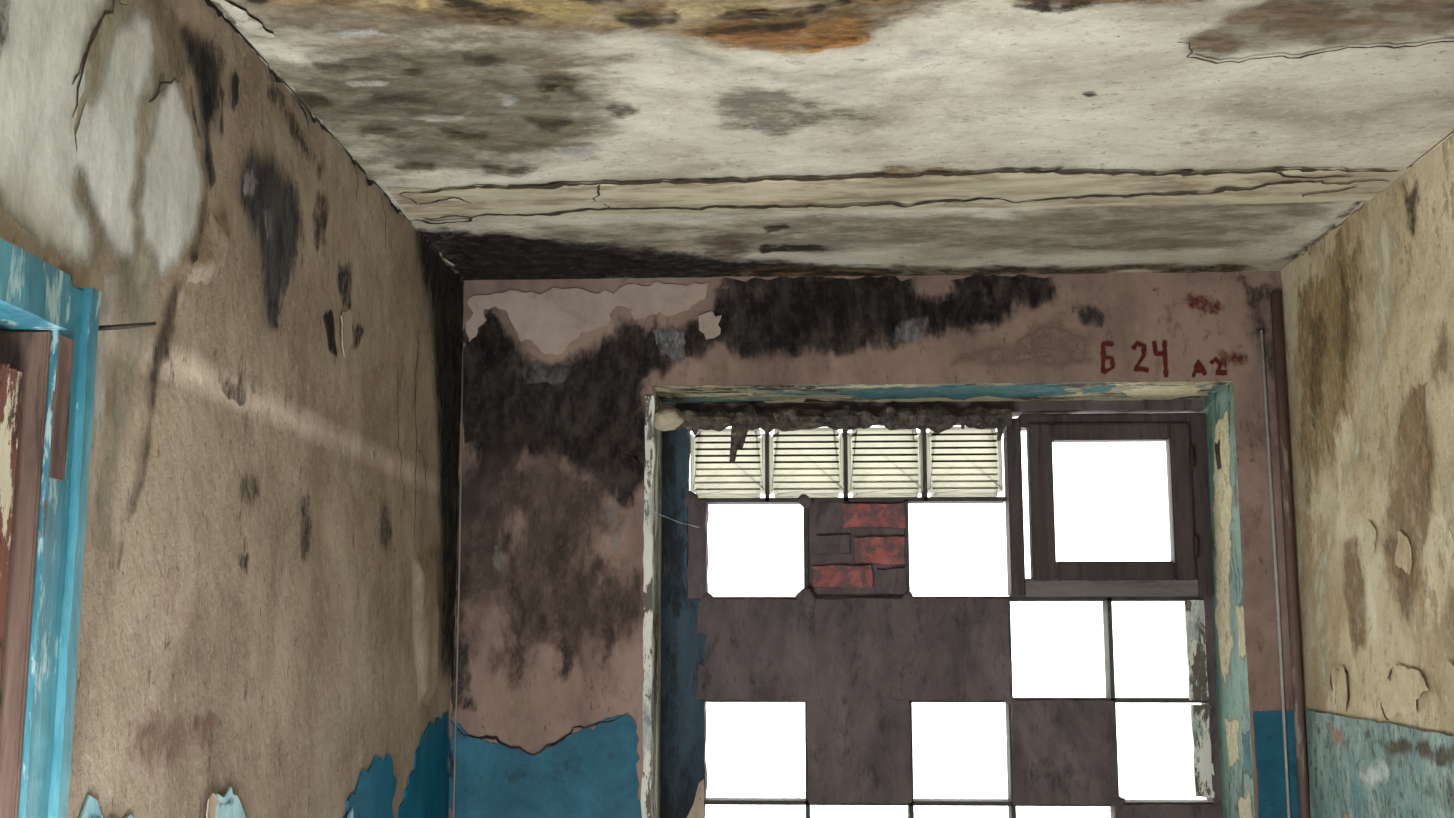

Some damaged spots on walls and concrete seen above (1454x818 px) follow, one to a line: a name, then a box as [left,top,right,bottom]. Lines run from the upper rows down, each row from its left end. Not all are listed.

peeling [0,0,200,361]
crack [72,0,129,117]
crack [148,74,181,103]
leakage [242,148,329,330]
leakage [210,0,959,180]
crack [204,0,1454,266]
spalling [674,384,1225,462]
leakage [542,201,1363,503]
leakage [451,447,643,716]
peeling [1184,411,1454,818]
peeling [206,787,246,818]
peeling [344,711,642,818]